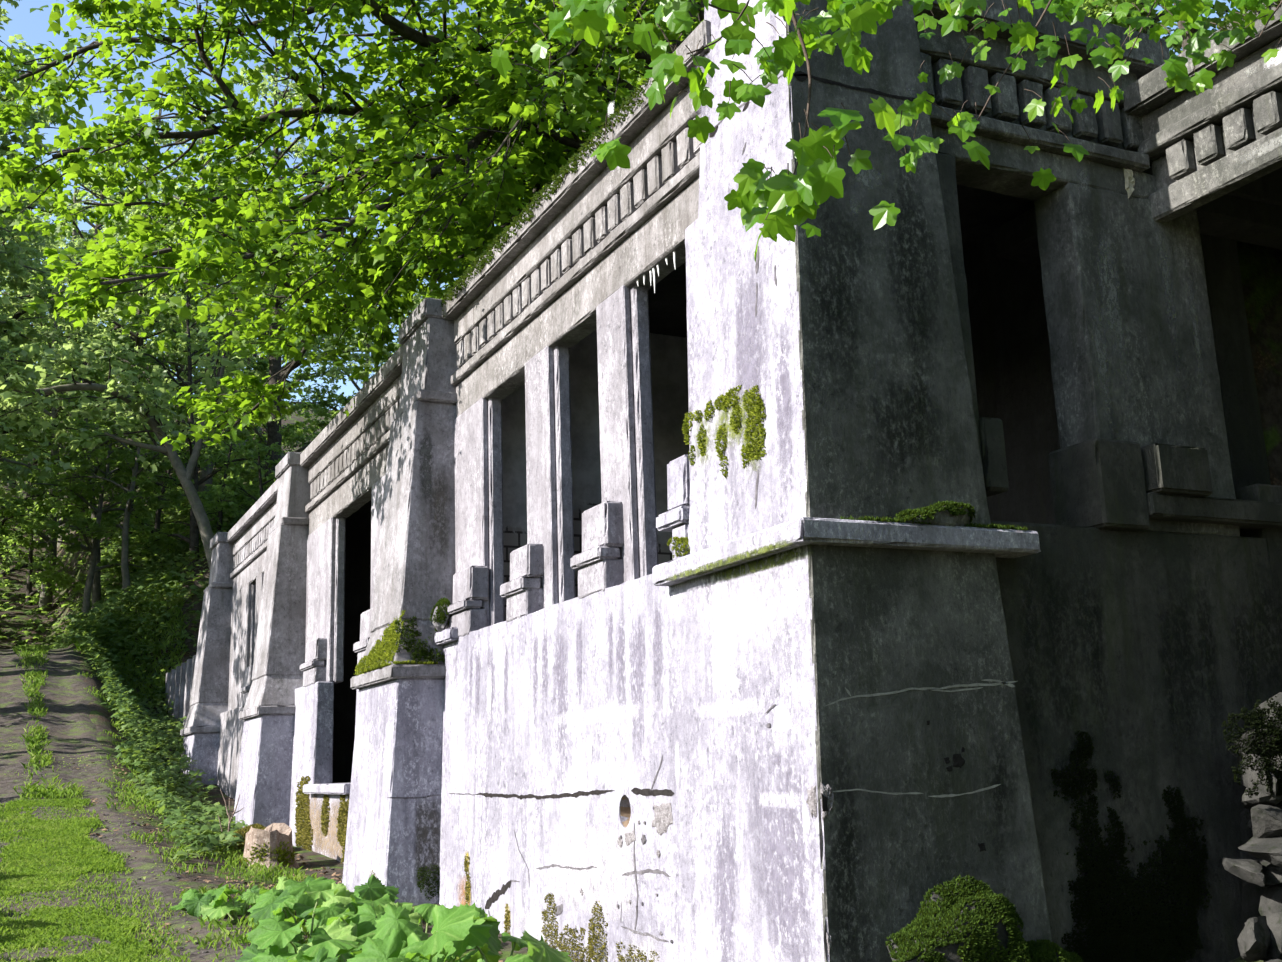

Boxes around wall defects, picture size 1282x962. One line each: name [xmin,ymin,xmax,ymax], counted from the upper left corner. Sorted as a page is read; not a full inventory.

leakage [452,652,507,762]
leakage [533,631,582,736]
leakage [608,611,661,731]
crack [826,679,1017,706]
crack [388,757,674,942]
flaking render [526,803,673,940]
flaking render [632,931,673,962]
leakage [716,829,736,960]
leakage [758,756,810,958]
crack [833,784,1001,798]